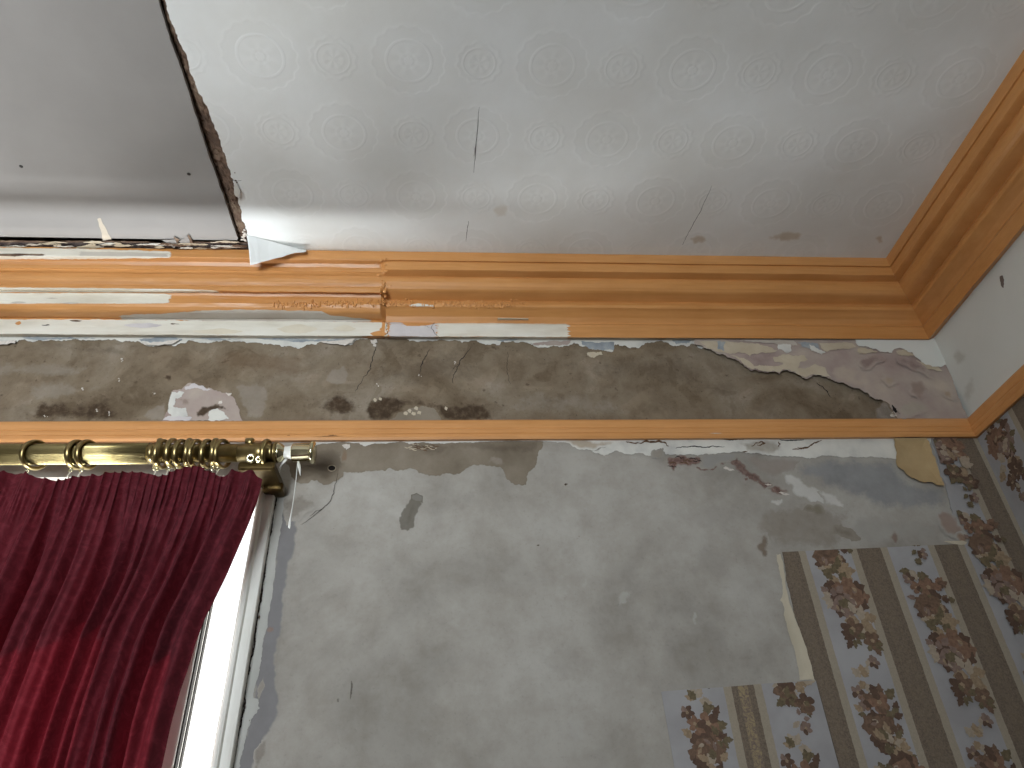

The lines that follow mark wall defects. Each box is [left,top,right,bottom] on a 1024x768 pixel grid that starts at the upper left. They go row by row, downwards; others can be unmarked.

crack [161,0,248,242]
water stain [192,344,723,420]
flaking render [0,287,968,422]
flaking render [301,439,897,486]
water stain [398,493,423,532]